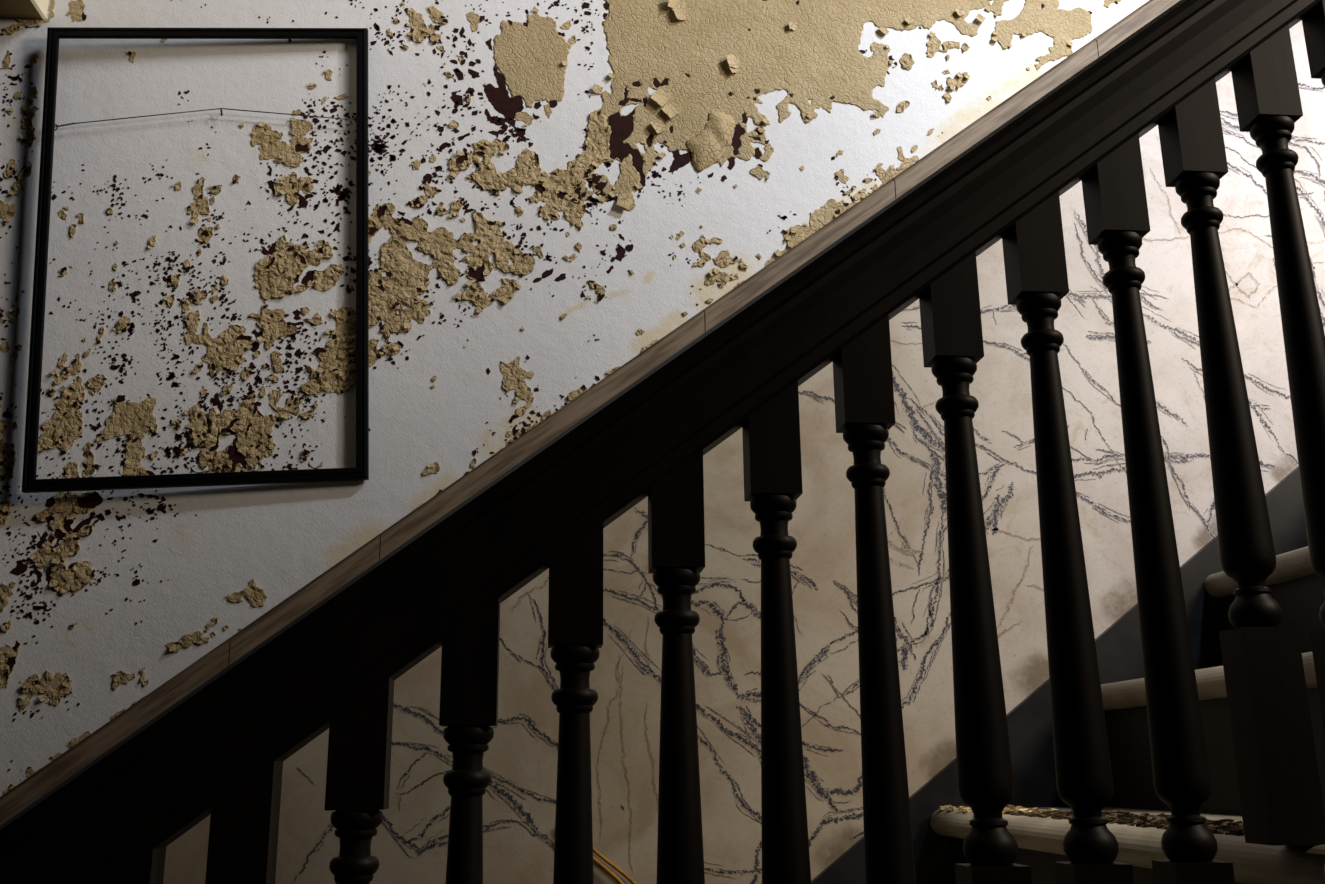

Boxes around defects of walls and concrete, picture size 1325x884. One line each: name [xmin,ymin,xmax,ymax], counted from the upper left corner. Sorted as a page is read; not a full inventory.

peeling [0,0,1121,722]